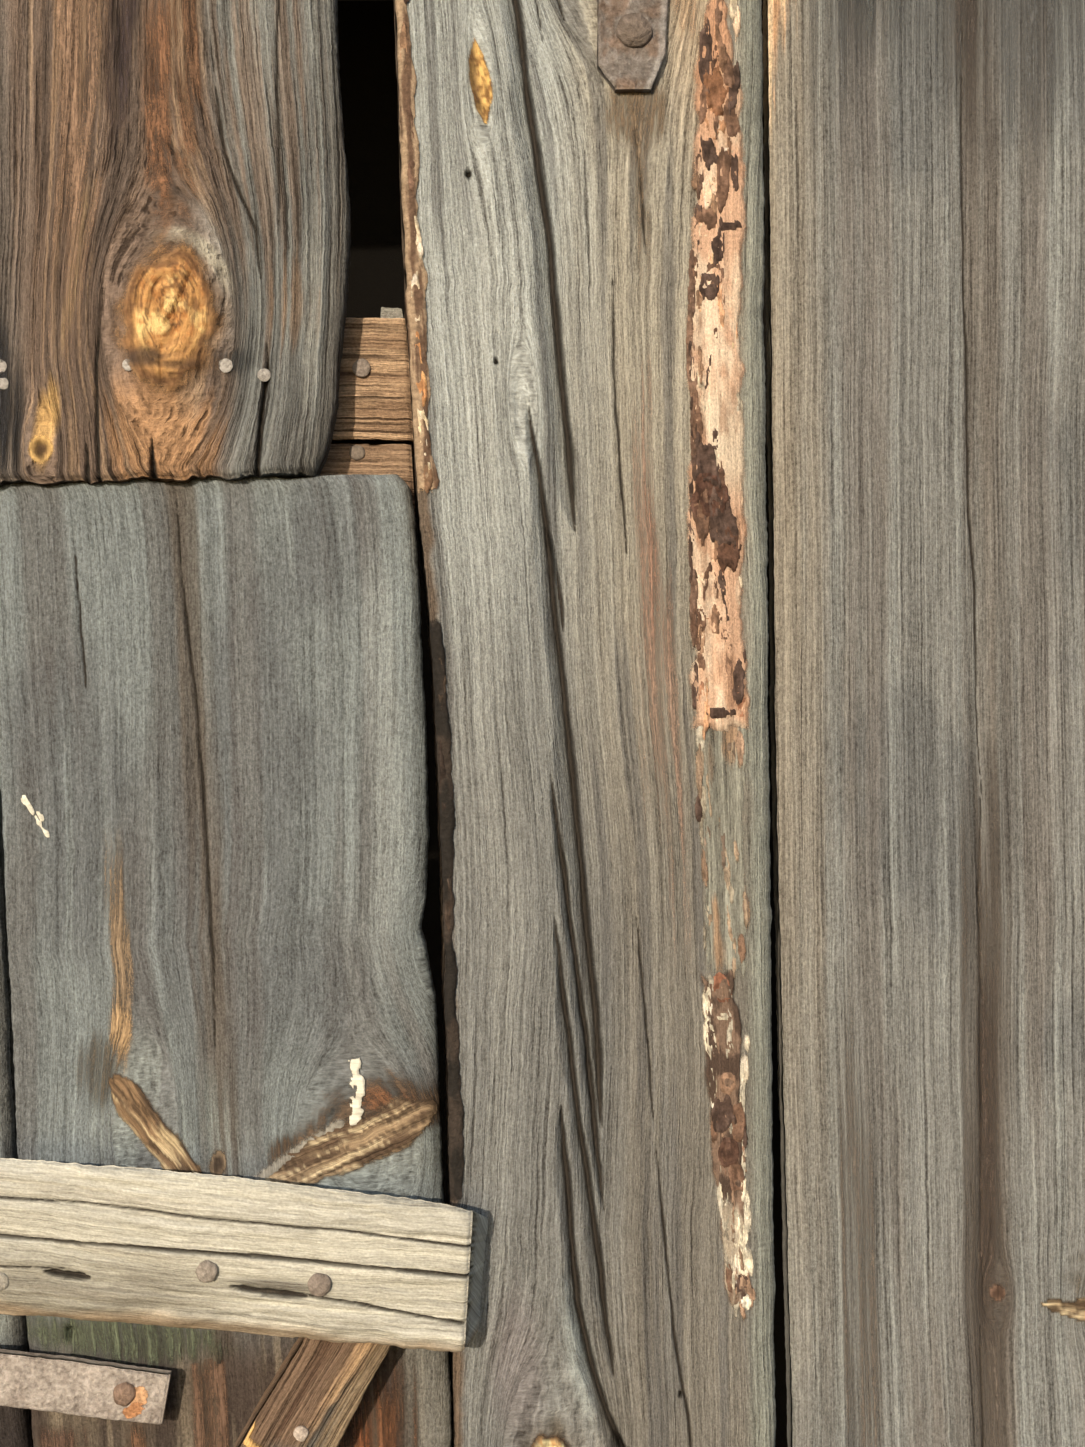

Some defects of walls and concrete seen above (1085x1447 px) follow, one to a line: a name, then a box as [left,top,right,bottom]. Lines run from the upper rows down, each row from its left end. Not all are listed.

crack [512,0,627,1447]
peeling [686,0,756,1319]
water stain [934,0,1085,126]